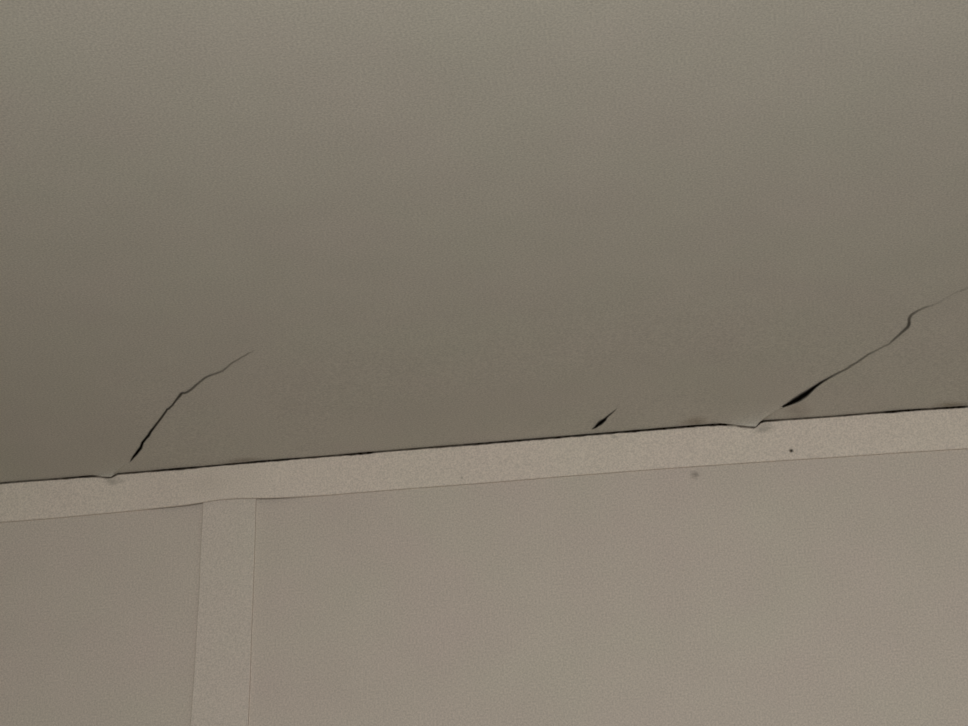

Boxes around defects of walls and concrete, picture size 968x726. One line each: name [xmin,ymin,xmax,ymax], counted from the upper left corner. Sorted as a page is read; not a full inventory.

crack [52,389,383,480]
crack [409,376,966,450]